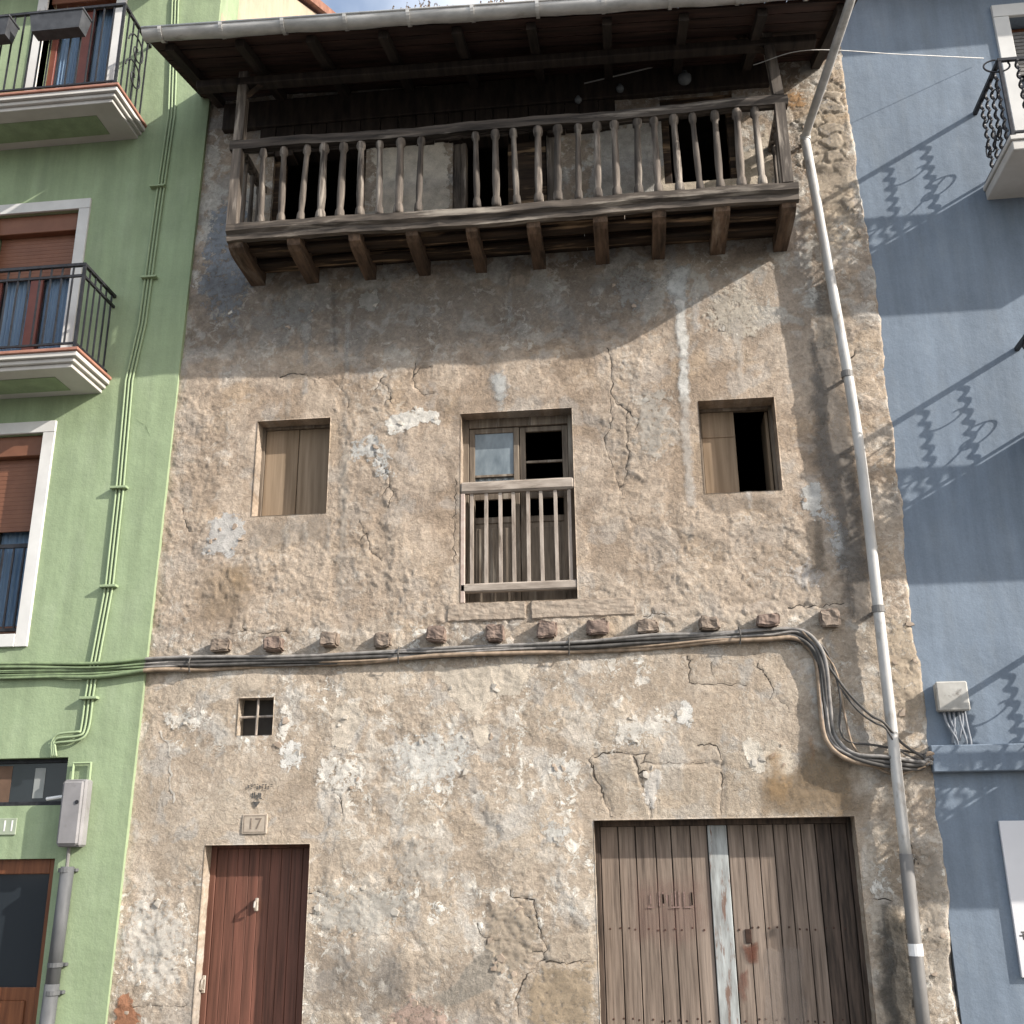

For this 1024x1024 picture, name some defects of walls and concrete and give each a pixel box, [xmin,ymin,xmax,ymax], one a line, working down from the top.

peeling [347,406,441,480]
crack [604,348,639,495]
leakage [667,264,695,505]
crack [687,656,789,709]
crack [588,743,724,817]
crack [477,890,590,1015]